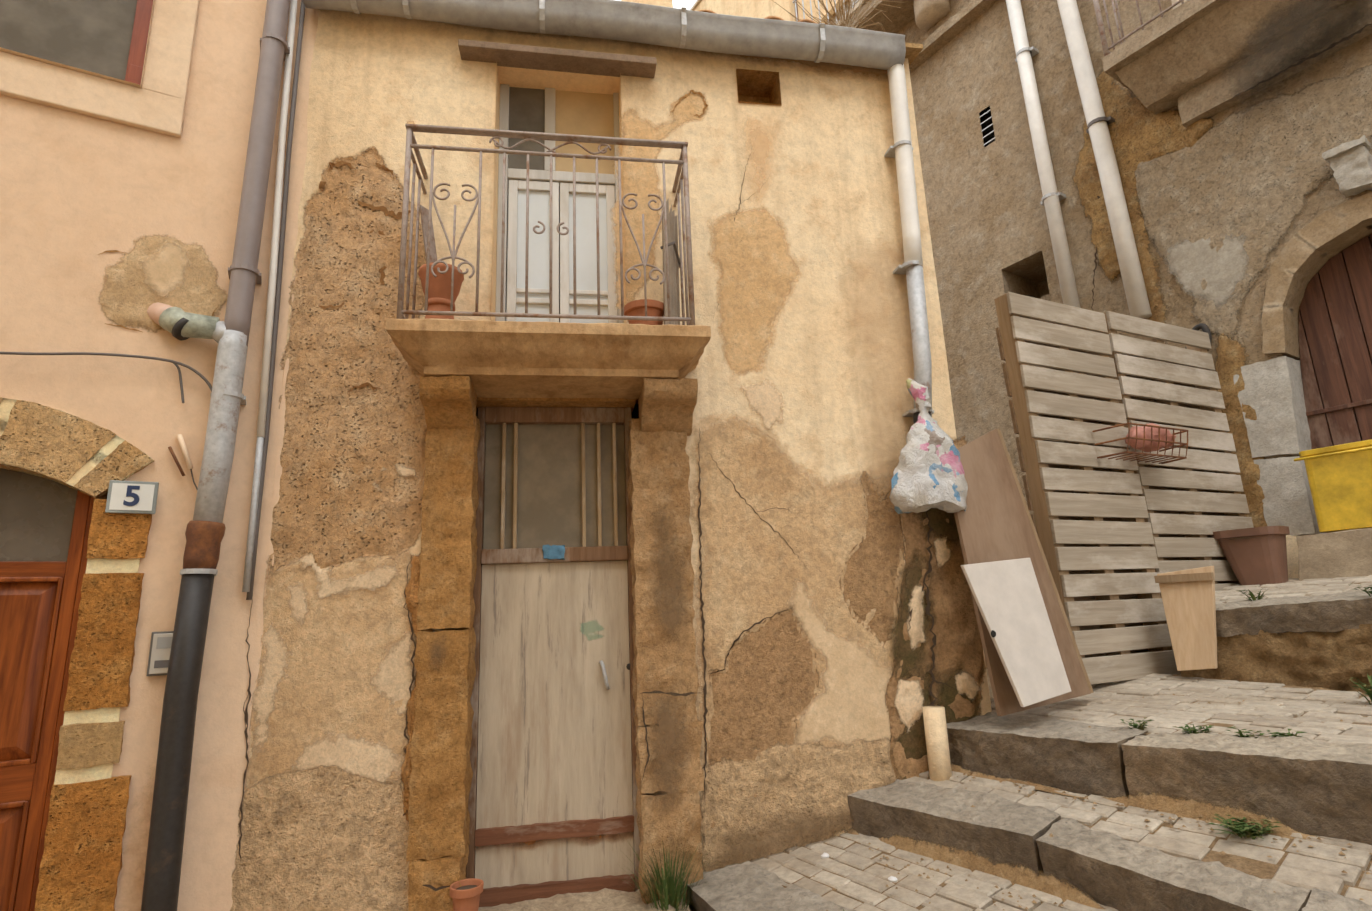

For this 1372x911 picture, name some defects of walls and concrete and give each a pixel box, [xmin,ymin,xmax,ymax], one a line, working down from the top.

spalling [1072,118,1121,283]
peeling [98,235,228,332]
peeling [1096,65,1372,527]
peeling [268,146,433,642]
spalling [953,435,968,449]
spalling [401,673,417,822]
crack [641,428,802,842]
peeling [704,608,819,766]
spalling [840,471,987,780]